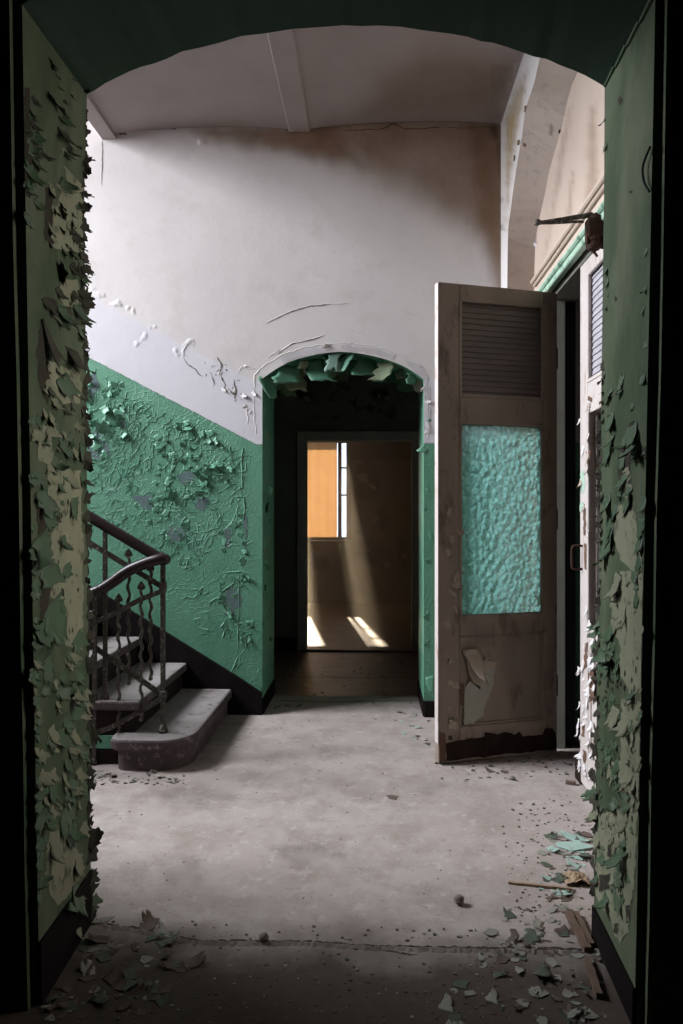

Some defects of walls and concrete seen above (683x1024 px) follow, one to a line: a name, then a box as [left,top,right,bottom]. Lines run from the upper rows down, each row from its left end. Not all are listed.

crack [266,303,369,337]
peeling [240,343,432,453]
peeling [23,58,206,1000]
peeling [132,420,233,542]
peeling [564,360,647,943]